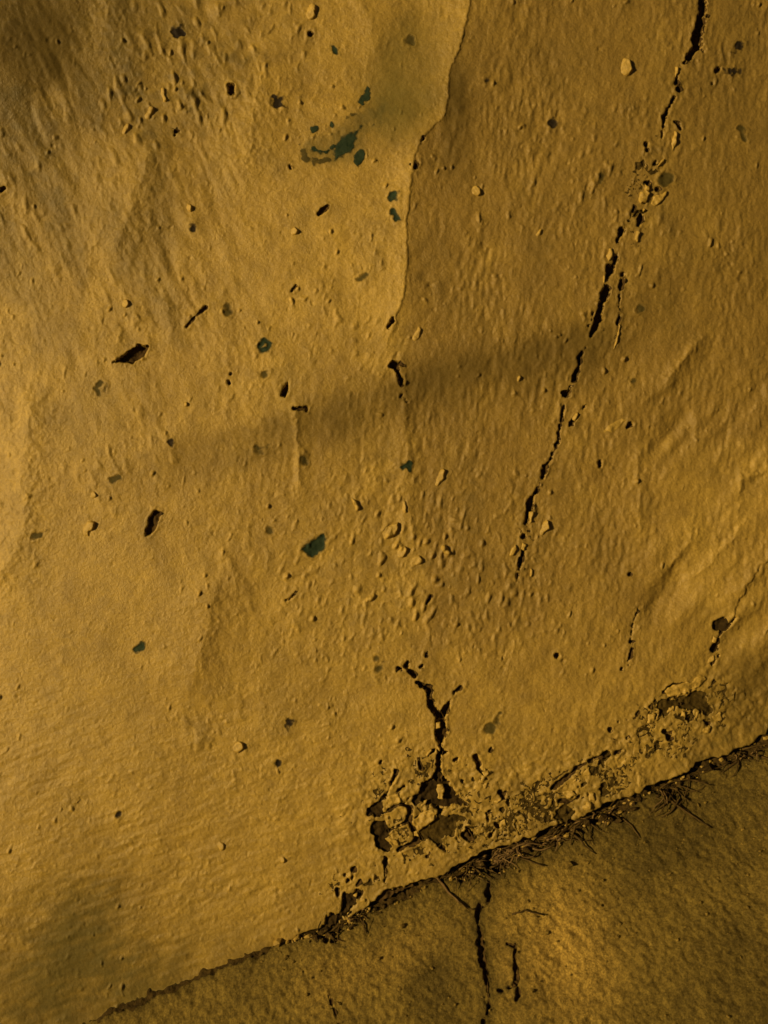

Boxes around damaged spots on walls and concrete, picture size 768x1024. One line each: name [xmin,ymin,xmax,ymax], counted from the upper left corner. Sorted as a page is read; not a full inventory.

crack [510,0,709,577]
crack [396,649,462,782]
peeling [318,675,735,931]
crack [321,935,341,944]
crack [328,993,340,1024]
crack [474,859,521,1024]